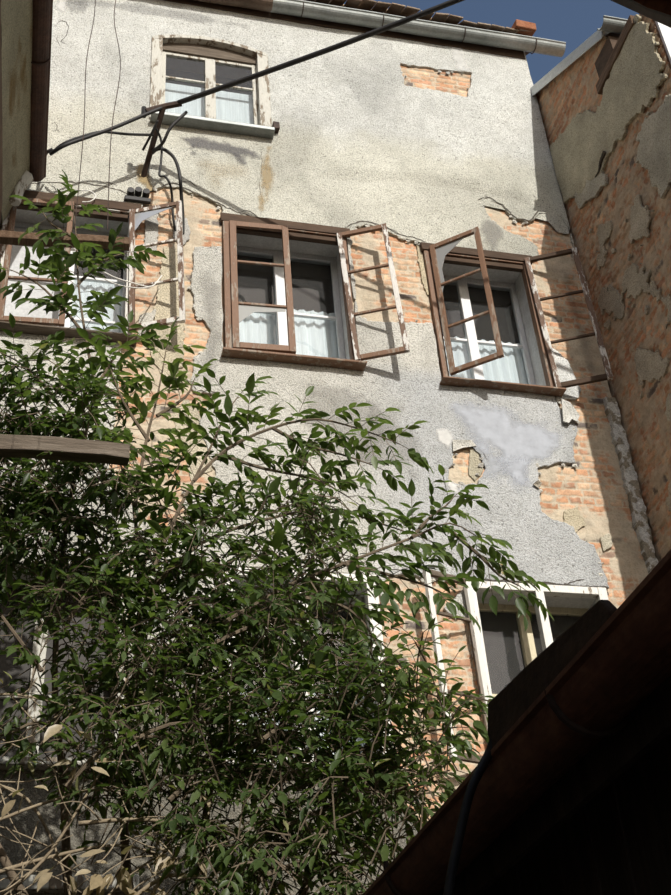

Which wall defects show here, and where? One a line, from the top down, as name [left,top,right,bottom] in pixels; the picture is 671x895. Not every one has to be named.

spalling [400,62,471,97]
flaking render [550,14,671,209]
crack [478,196,545,224]
spalling [346,223,434,329]
spalling [109,184,222,527]
spalling [478,201,658,609]
spalling [445,440,485,488]